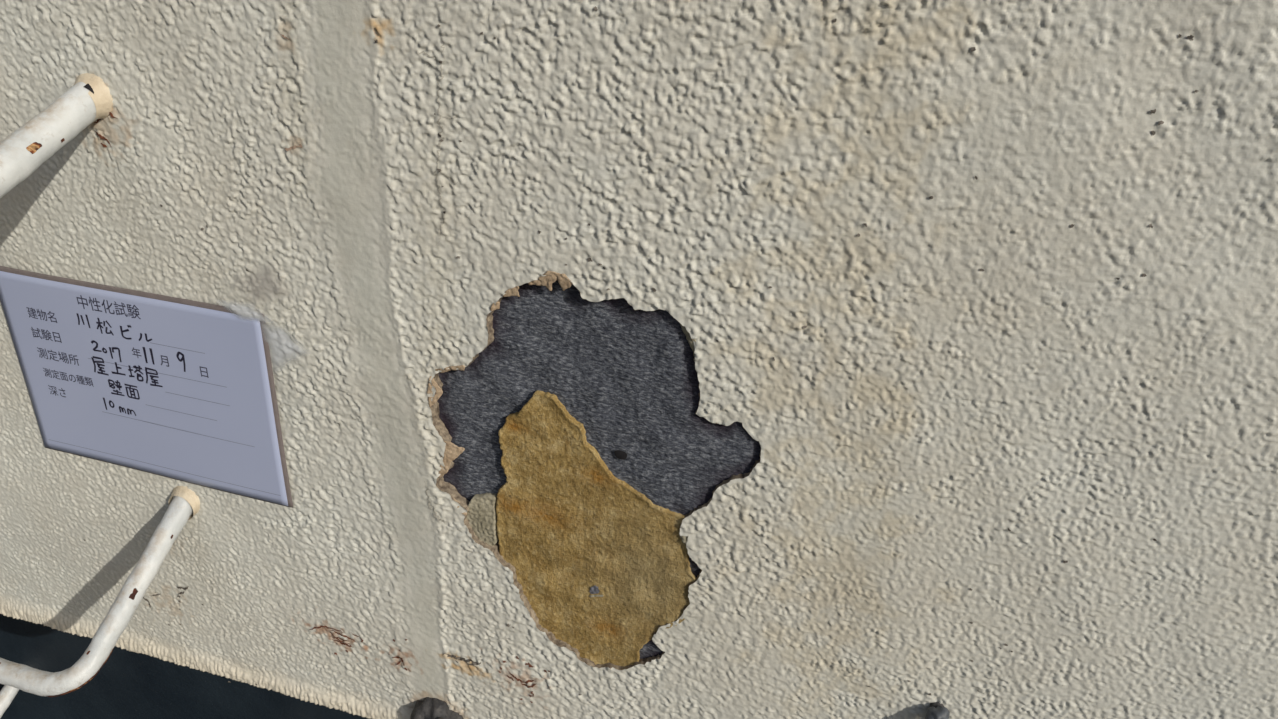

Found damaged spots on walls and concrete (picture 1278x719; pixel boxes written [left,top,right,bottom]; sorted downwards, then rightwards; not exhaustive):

crack [417,24,462,250]
peeling [427,271,761,670]
rust [309,625,364,655]